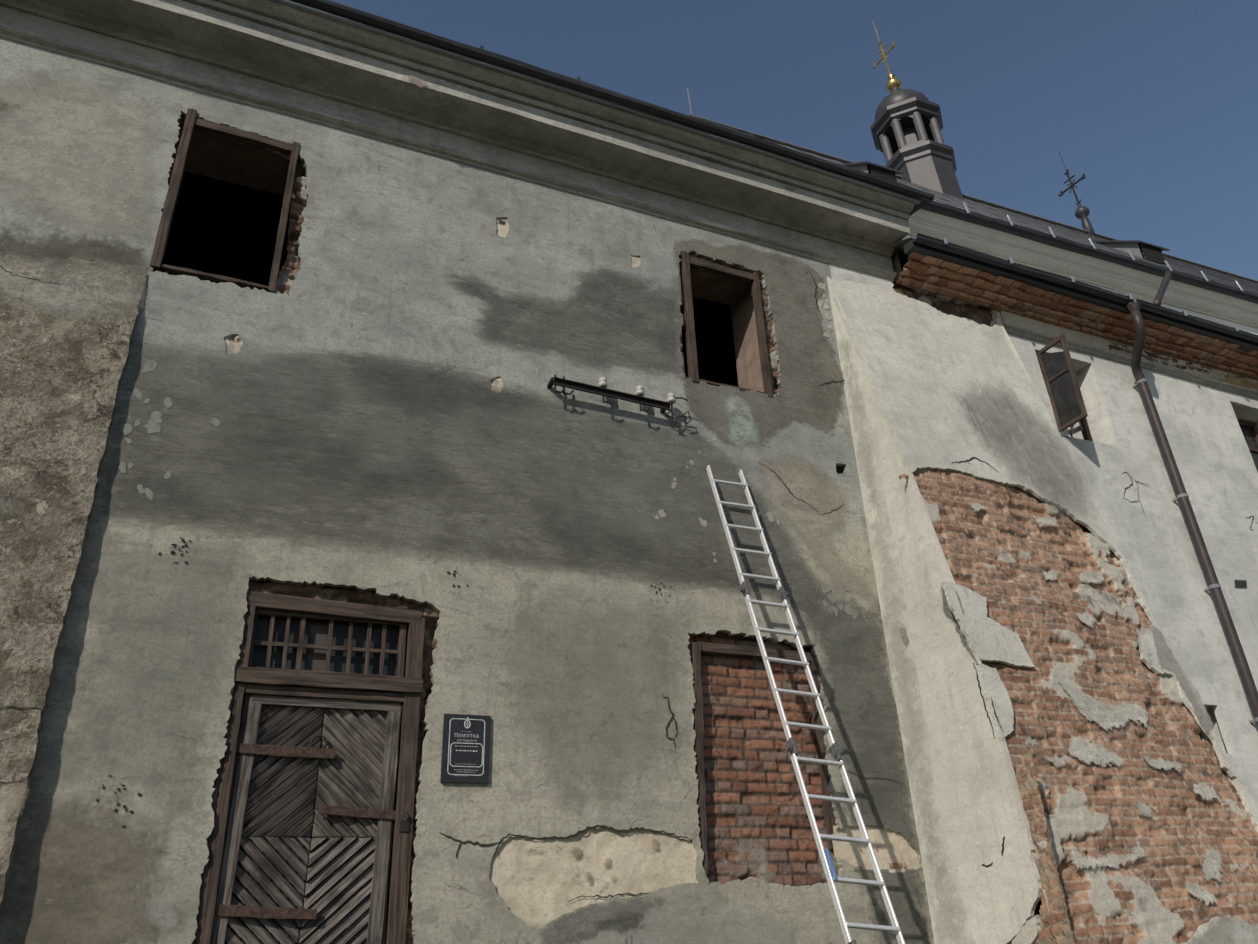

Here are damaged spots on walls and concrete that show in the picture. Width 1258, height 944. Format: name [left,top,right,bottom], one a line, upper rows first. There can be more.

damp [0,231,142,265]
damp [457,256,680,373]
flaking render [892,278,993,327]
crack [760,463,844,515]
crack [1121,472,1147,511]
damp [104,349,919,850]
crack [662,694,678,748]
flaking render [899,468,1258,944]
spalling [248,582,439,944]
crack [439,832,503,858]
flaking render [489,825,698,929]
damp [858,869,929,944]